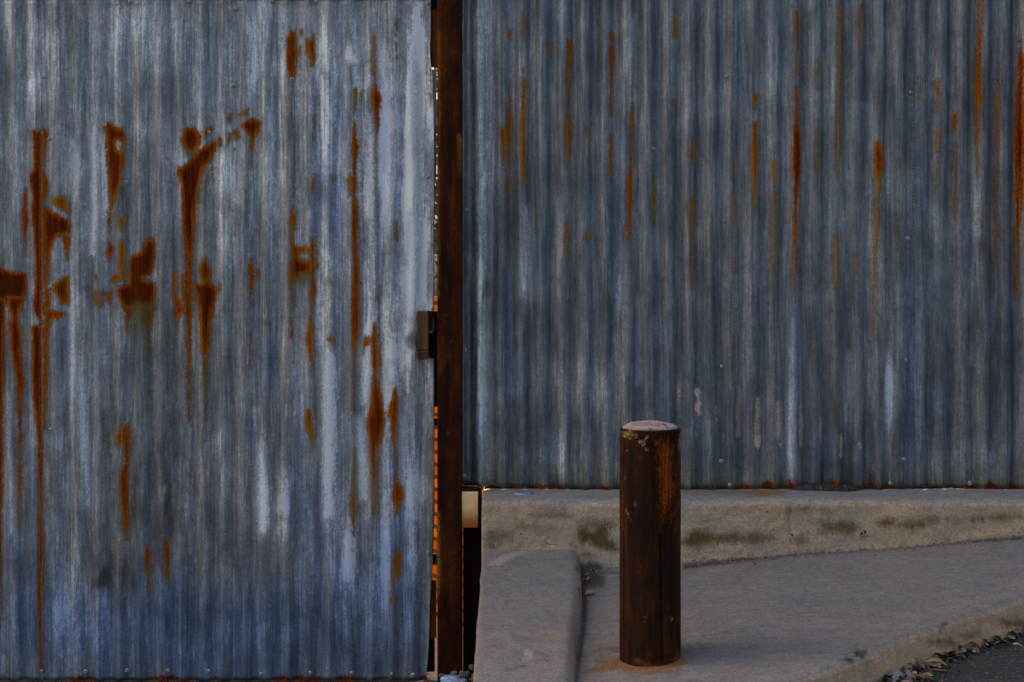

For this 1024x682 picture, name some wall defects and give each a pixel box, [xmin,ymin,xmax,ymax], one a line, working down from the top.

rust [0,128,71,670]
rust [106,421,131,540]
rust [86,122,157,356]
rust [172,108,267,425]
rust [285,28,319,369]
rust [330,3,404,536]
rust [791,11,801,300]
rust [871,141,888,333]
rust [1013,34,1024,302]